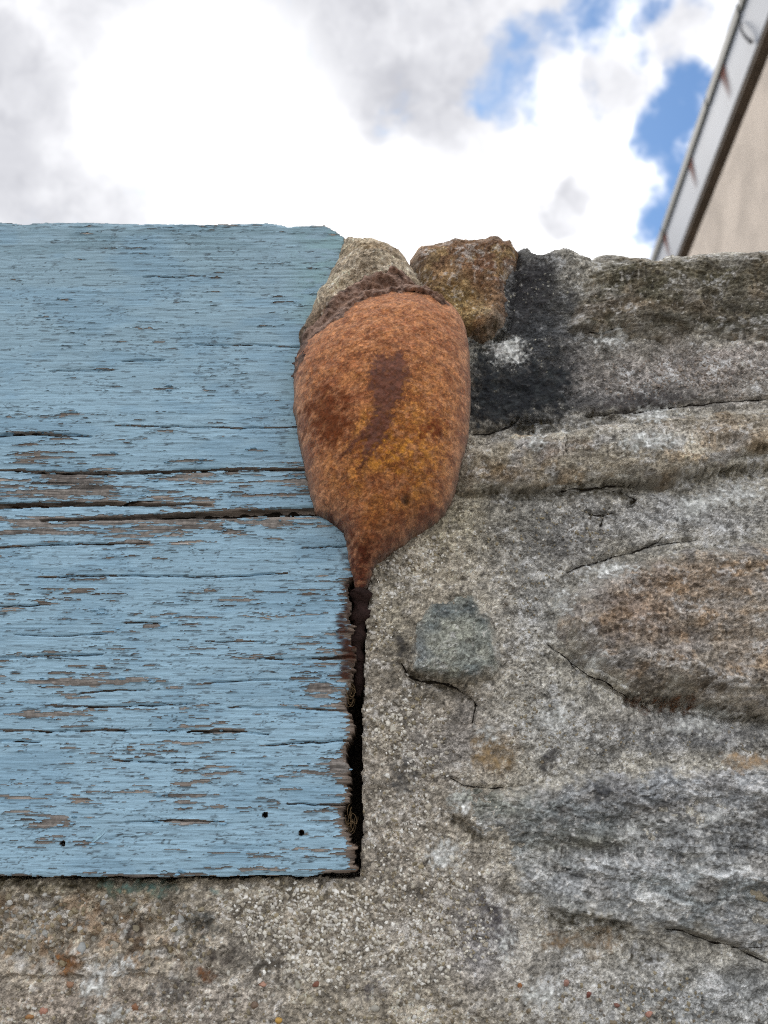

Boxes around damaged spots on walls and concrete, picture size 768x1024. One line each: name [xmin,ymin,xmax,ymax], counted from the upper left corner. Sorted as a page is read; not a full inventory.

water stain [470,341,577,428]
corrosion [299,350,411,473]
peeling [0,458,308,543]
crack [567,540,695,573]
peeling [115,613,208,632]
peeling [17,676,162,688]
crack [401,663,477,724]
crack [547,644,627,698]
peeling [3,710,88,720]
peeling [286,760,353,776]
peeling [29,814,77,828]
peeling [149,791,226,825]